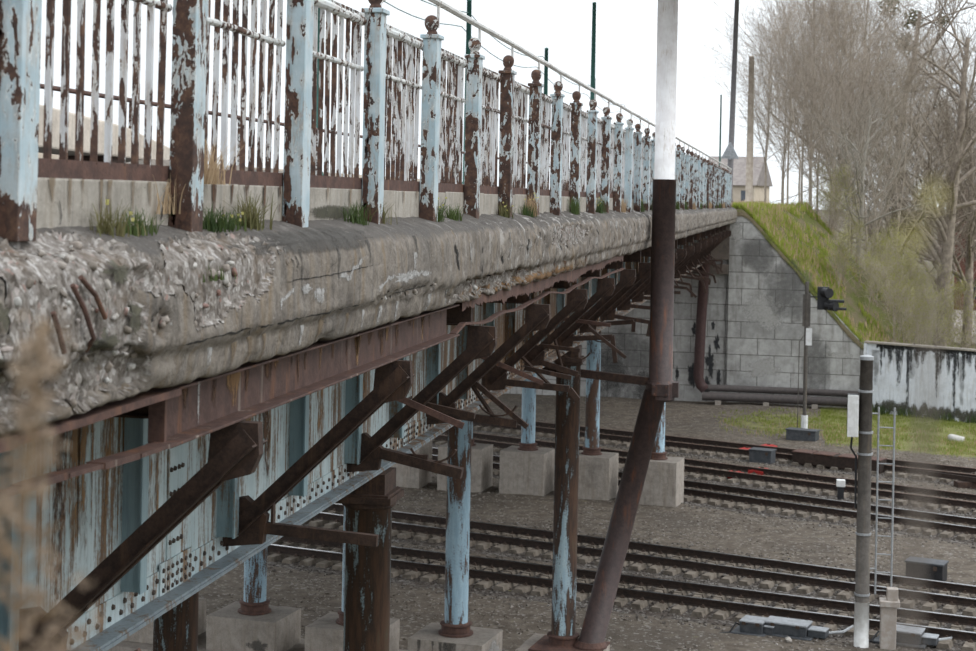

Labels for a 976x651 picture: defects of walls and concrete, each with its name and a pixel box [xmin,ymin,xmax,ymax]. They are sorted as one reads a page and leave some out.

peeling [283,24,297,224]
spalling [0,124,294,431]
damp [875,344,976,406]
corrosion [245,410,271,475]
corrosion [309,389,323,438]
corrosion [40,417,125,599]
corrosion [148,452,159,510]